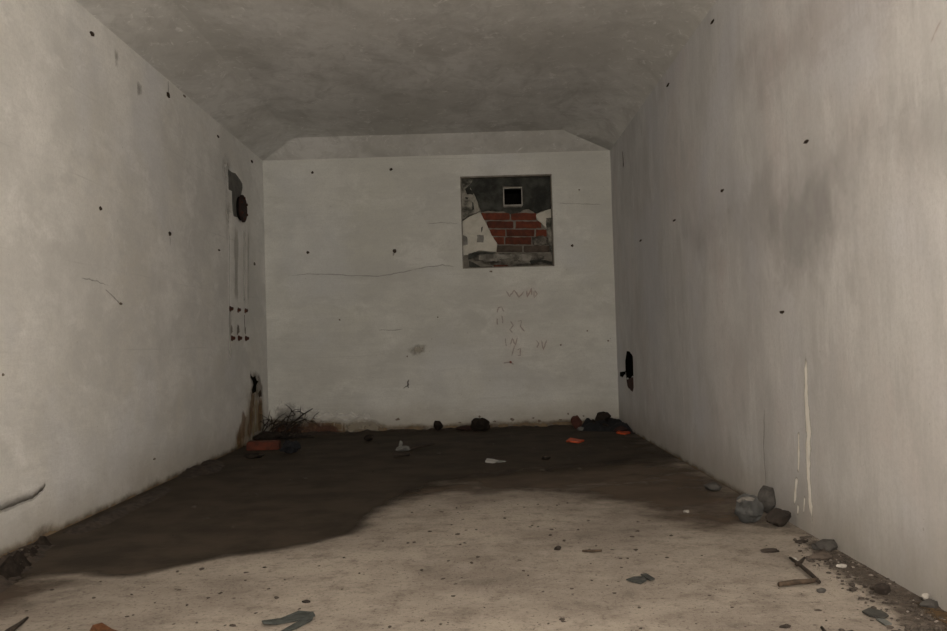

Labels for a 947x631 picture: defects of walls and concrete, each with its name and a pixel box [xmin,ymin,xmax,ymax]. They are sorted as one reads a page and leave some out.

flaking render [461,177,552,267]
corrosion [236,395,263,450]